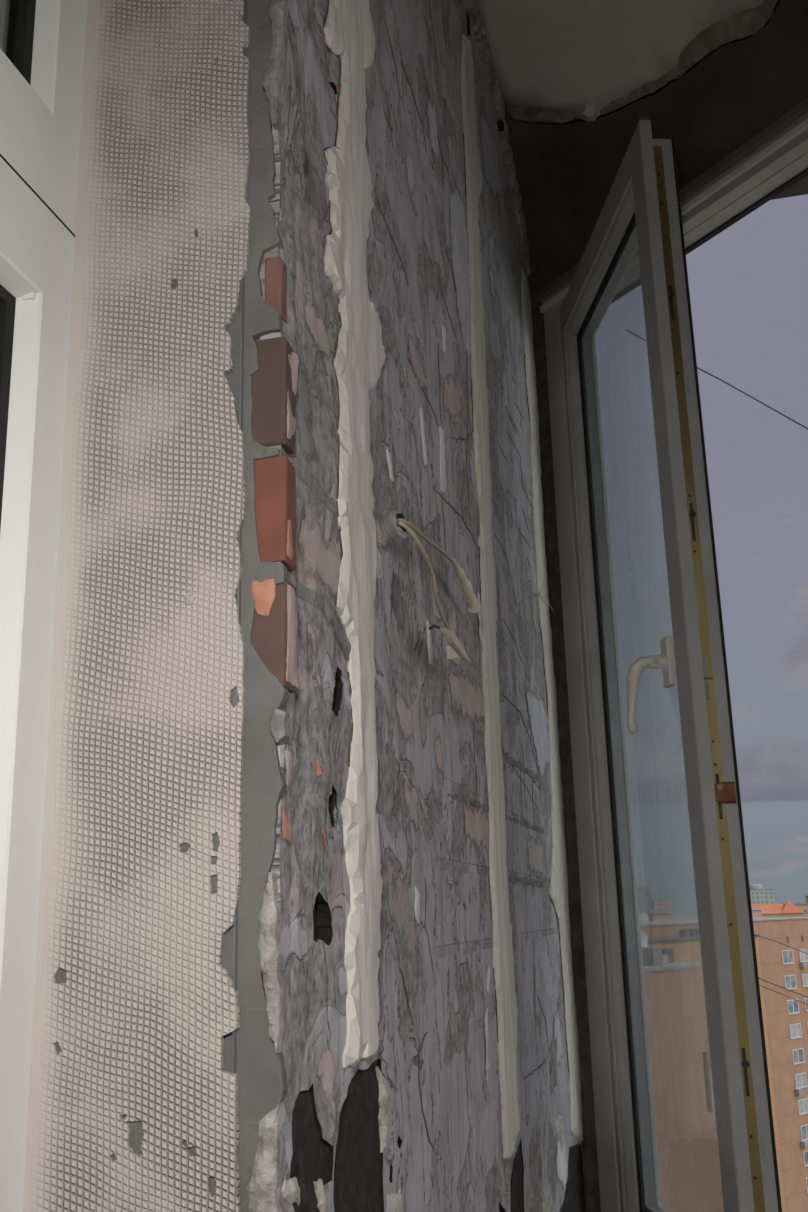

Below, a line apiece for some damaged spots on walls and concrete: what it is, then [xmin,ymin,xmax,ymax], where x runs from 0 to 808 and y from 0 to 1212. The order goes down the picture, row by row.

crack [385,0,450,191]
flaking render [497,0,778,132]
crack [376,198,409,286]
crack [407,222,533,578]
crack [502,693,541,821]
crack [421,879,429,926]
crack [399,967,434,1150]
crack [523,995,549,1079]
flaking render [549,1036,557,1099]
flaking render [290,1060,381,1212]
flaking render [485,1117,543,1212]
flaking render [560,1145,585,1212]